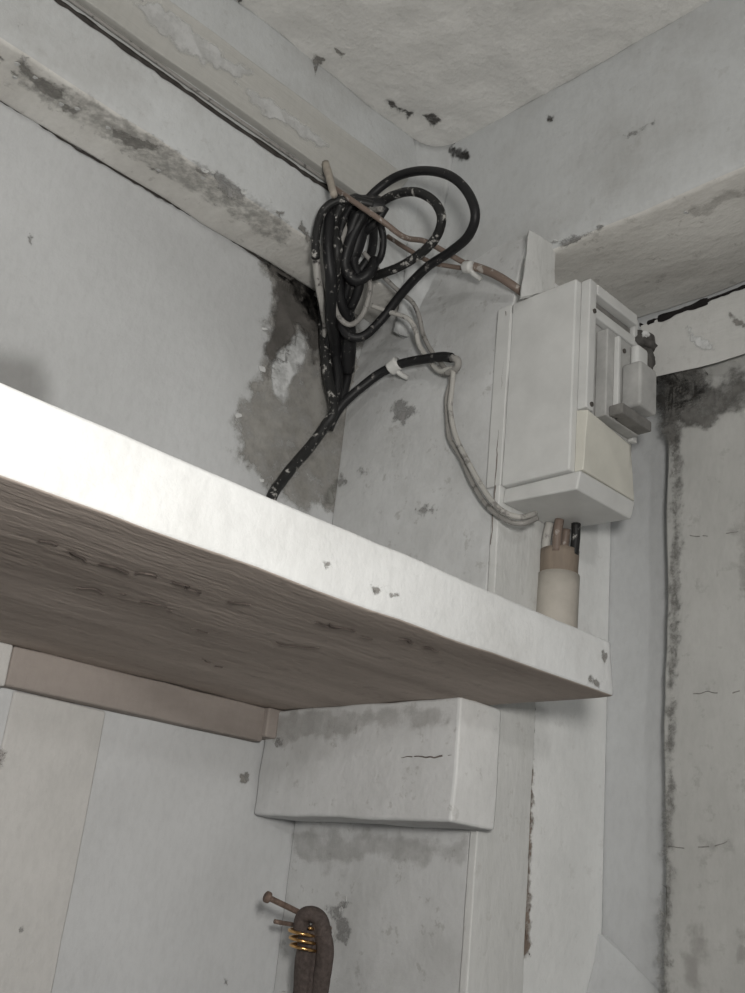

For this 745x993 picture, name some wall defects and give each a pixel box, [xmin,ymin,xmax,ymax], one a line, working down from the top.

spalling [12,56,80,114]
spalling [106,126,157,150]
peeling [234,260,347,512]
crack [37,540,202,594]